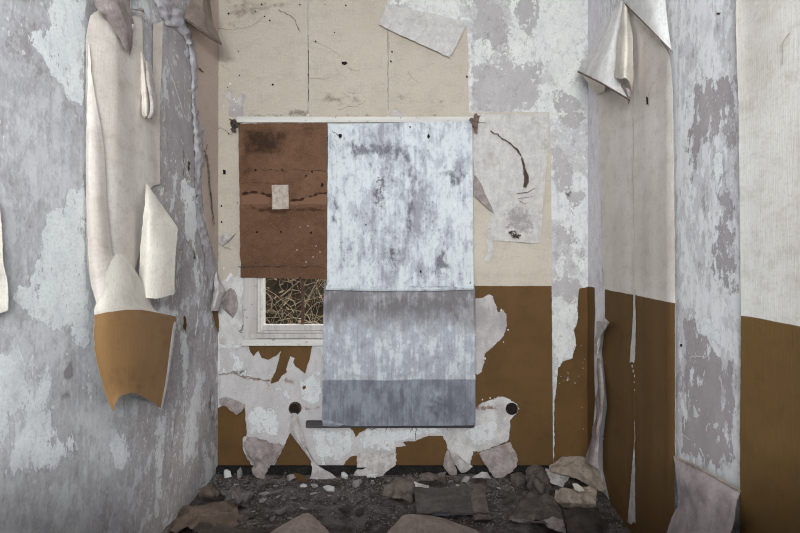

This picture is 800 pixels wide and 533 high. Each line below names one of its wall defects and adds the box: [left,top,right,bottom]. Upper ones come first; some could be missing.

peeling [470,0,604,470]
flaking render [684,68,739,295]
flaking render [218,265,519,488]
flaking render [677,313,738,470]